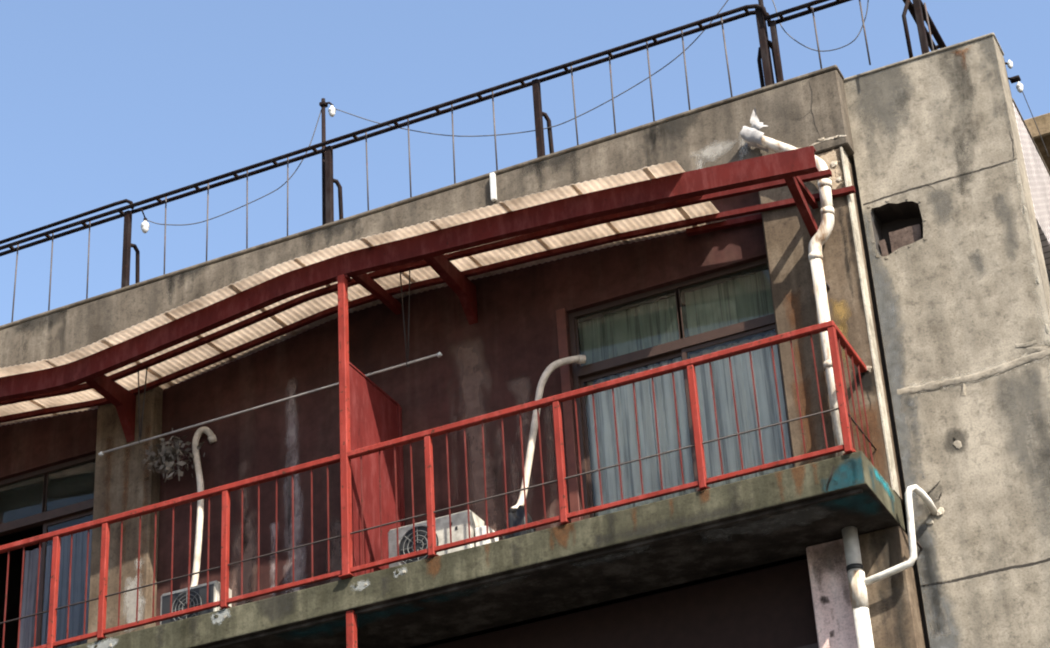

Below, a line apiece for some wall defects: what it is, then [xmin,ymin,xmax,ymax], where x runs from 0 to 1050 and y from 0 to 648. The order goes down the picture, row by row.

leakage [983,36,998,72]
leakage [858,66,905,131]
hole [872,219,927,260]
leakage [451,341,533,541]
spalling [947,432,965,450]
leakage [264,384,304,619]
crack [921,558,1050,587]